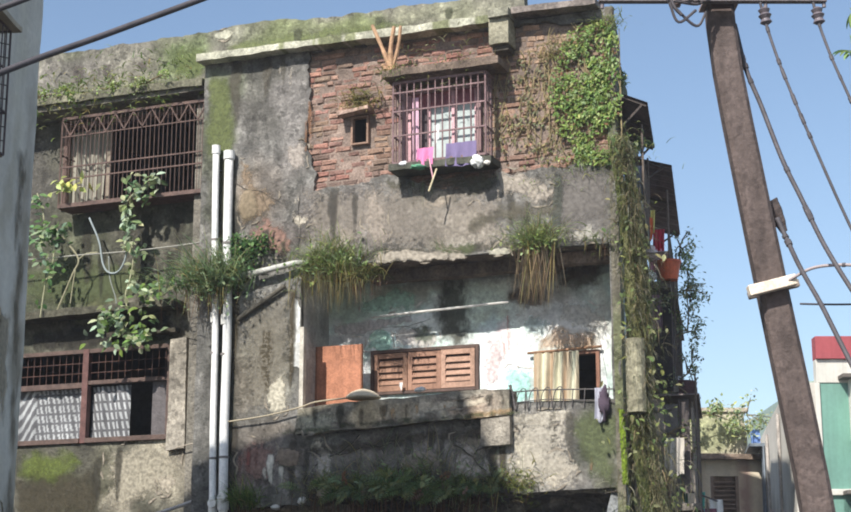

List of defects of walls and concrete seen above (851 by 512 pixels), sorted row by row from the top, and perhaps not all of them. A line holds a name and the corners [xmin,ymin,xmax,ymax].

flaking render [288,18,617,265]
water stain [16,155,26,235]
water stain [414,284,466,343]
peeling [524,318,554,342]
water stain [9,458,101,512]